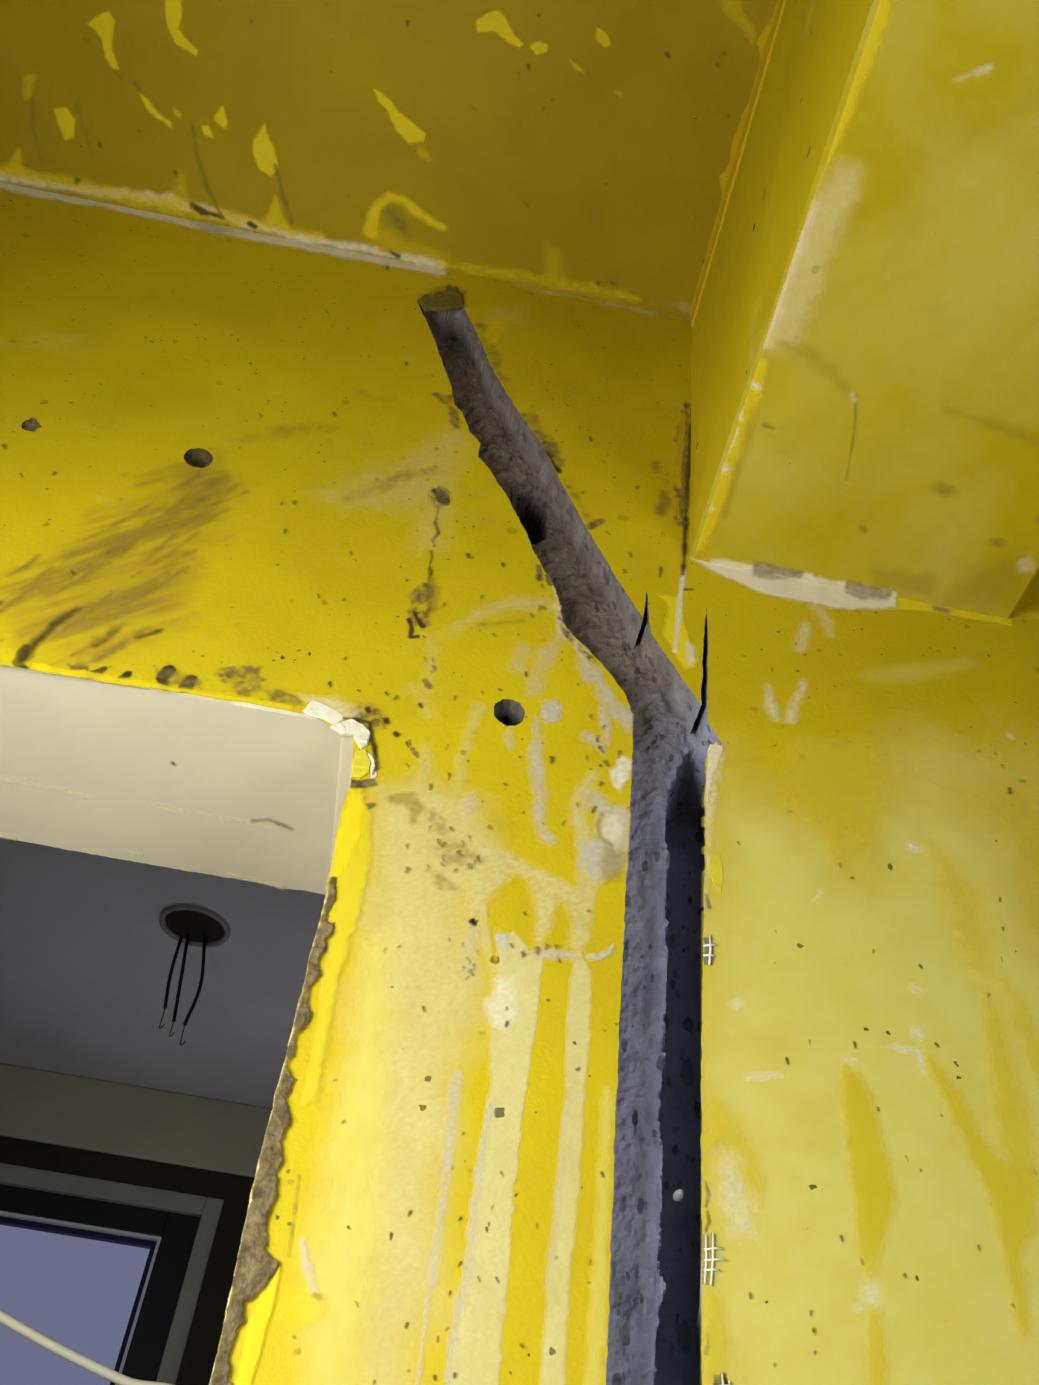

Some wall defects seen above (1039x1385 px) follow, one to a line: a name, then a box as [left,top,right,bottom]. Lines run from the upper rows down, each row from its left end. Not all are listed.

flaking render [692,558,897,609]
spalling [226,873,283,888]
spalling [210,877,337,1385]
spalling [303,700,409,788]
peeling [289,787,515,1385]
leakage [426,1079,460,1304]
leakage [445,772,597,1385]
leakage [531,723,553,842]
flaking render [532,945,614,960]
peeling [704,741,1039,1385]